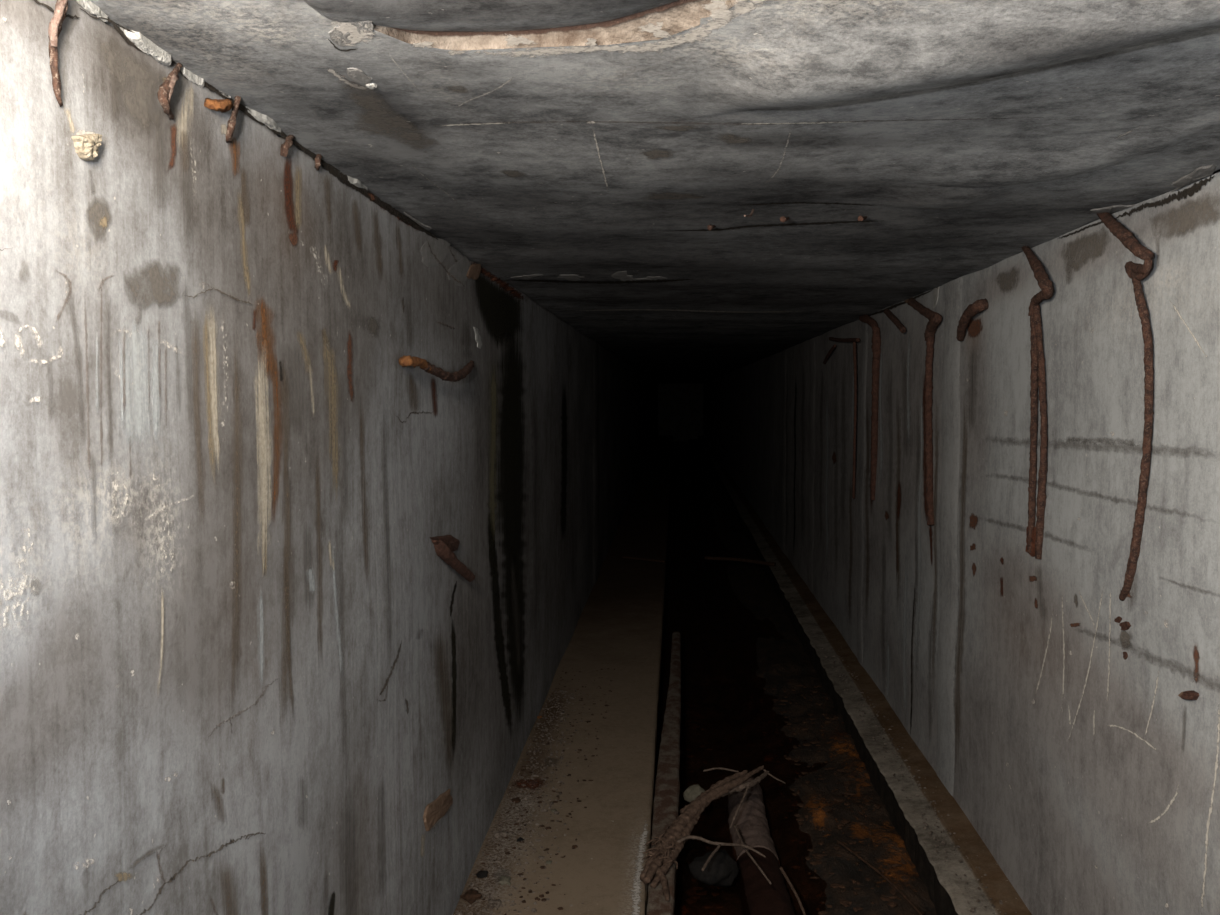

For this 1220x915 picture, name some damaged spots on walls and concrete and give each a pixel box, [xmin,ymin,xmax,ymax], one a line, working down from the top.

spalling [328,0,766,58]
leakage [126,262,177,307]
rust [169,89,196,180]
rust [222,125,250,291]
rust [284,159,350,305]
spalling [34,0,693,382]
rust [252,301,289,571]
rust [322,331,354,487]
rust [922,381,933,563]
crack [84,835,252,915]